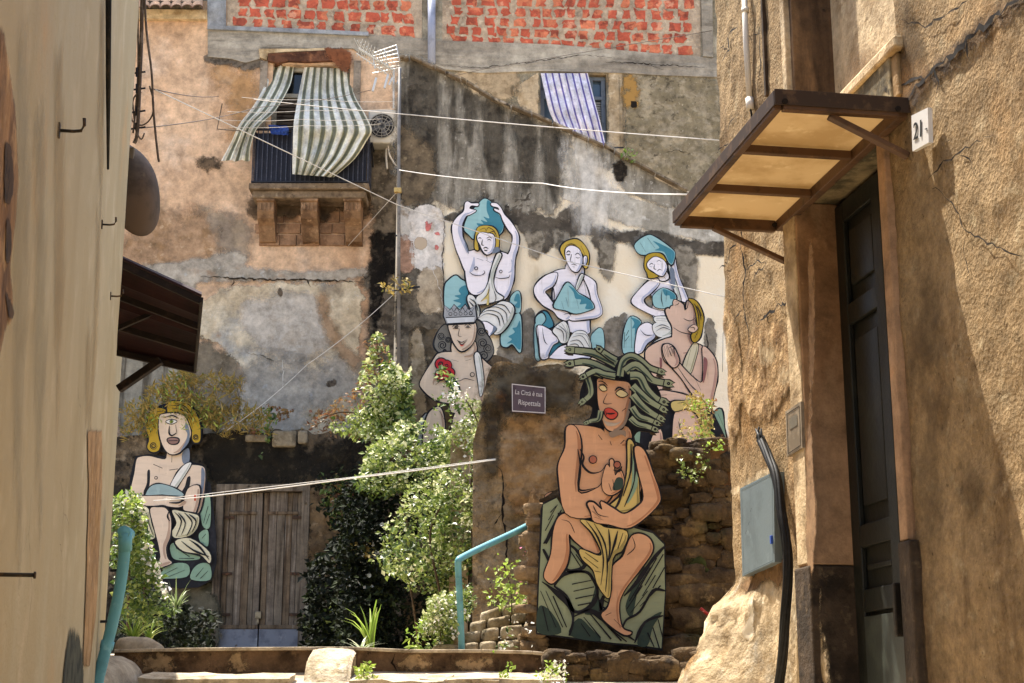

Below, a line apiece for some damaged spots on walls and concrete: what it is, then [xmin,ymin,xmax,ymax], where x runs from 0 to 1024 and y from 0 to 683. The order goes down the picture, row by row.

crack [901,0,1019,100]
damp [246,196,257,220]
damp [277,206,301,219]
crack [201,241,386,306]
damp [320,207,344,223]
damp [360,52,724,409]
crack [928,135,1020,275]
peeling [200,280,369,434]